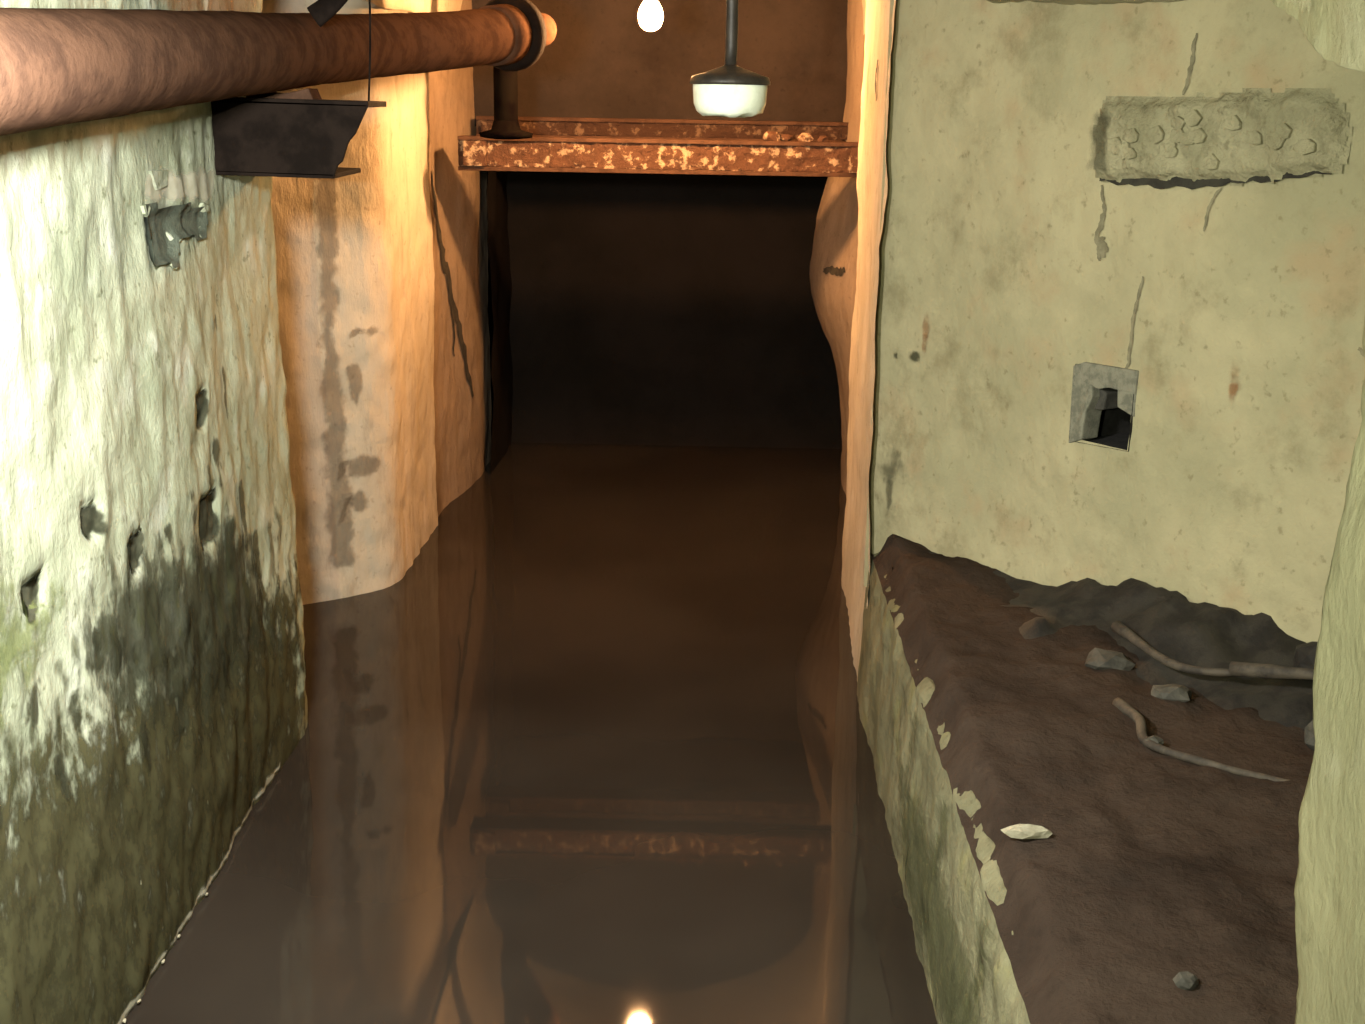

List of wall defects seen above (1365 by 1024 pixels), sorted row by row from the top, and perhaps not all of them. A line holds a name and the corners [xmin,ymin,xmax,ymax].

spalling [1092,88,1352,190]
water stain [208,439,222,492]
water stain [0,480,306,1024]